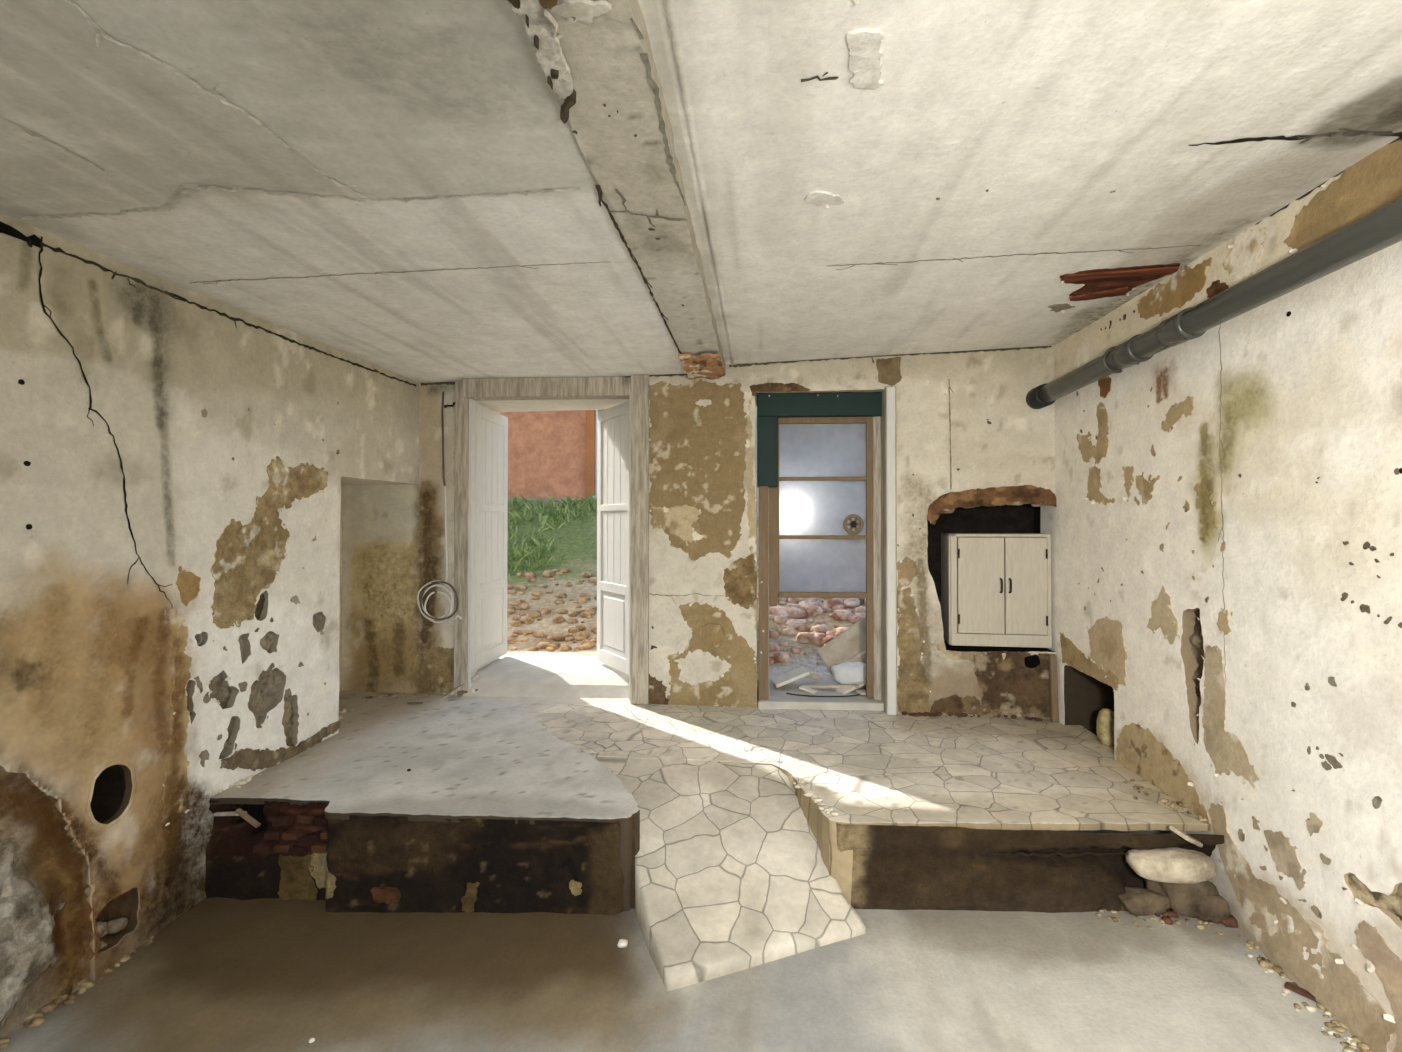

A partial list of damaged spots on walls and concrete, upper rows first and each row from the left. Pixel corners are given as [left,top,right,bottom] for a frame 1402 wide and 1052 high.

crack [0,18,687,605]
peeling [1100,227,1266,331]
crack [1188,128,1402,146]
crack [1255,170,1345,225]
peeling [1284,140,1402,254]
peeling [161,456,341,833]
damp [363,489,442,692]
peeling [648,353,818,708]
peeling [1076,376,1160,506]
peeling [1194,596,1260,800]
spalling [0,772,86,1039]
peeling [1115,723,1402,1052]